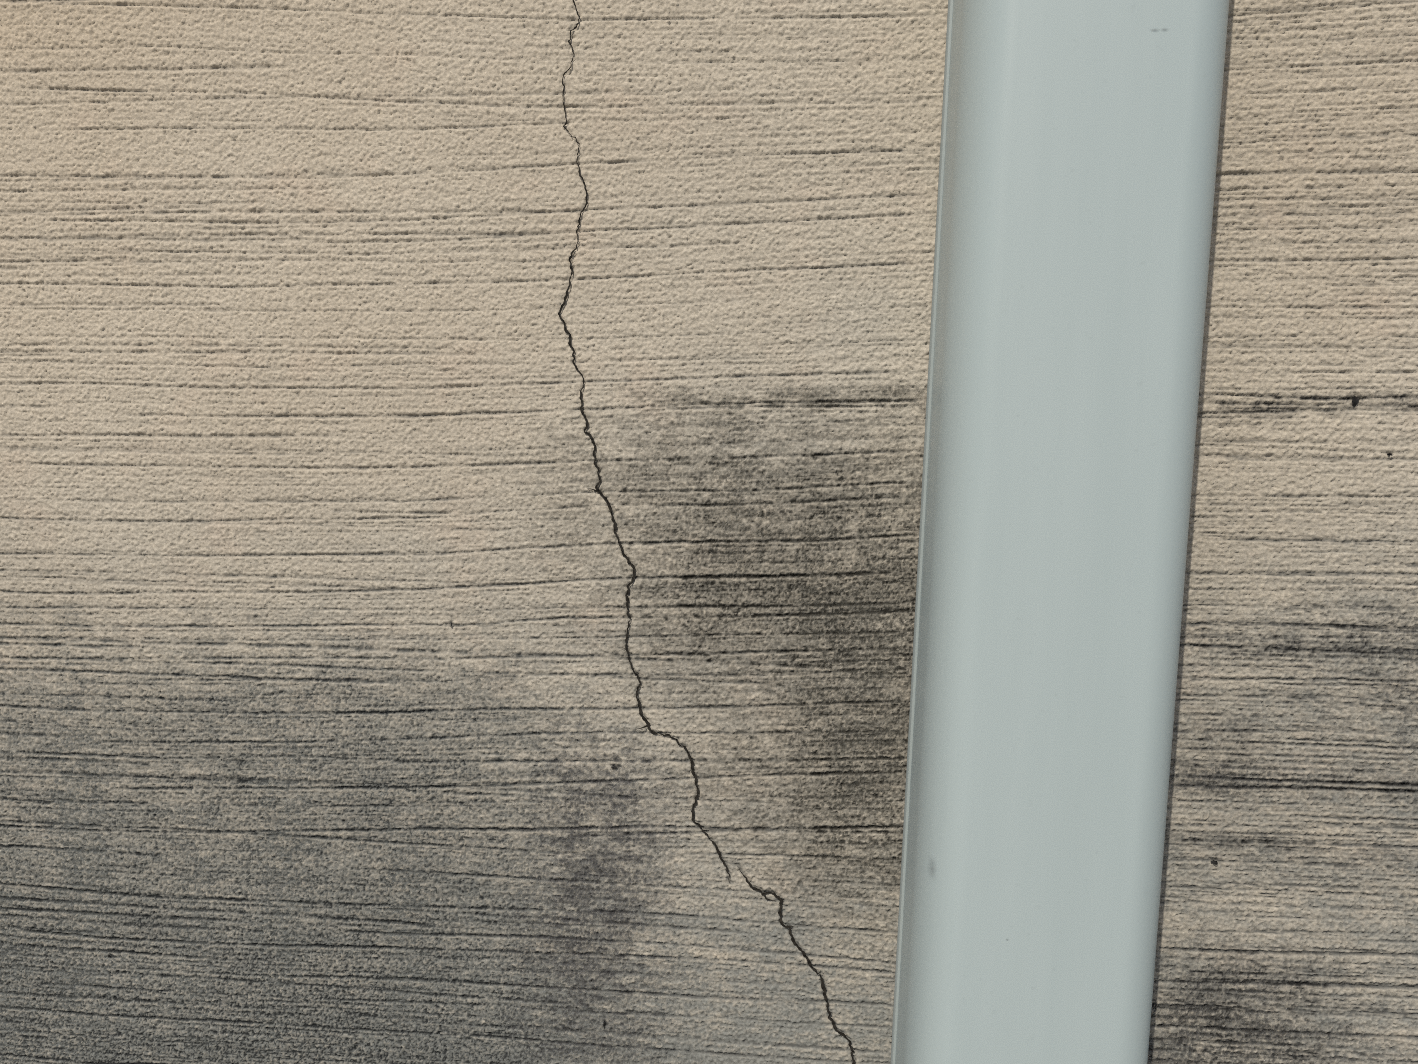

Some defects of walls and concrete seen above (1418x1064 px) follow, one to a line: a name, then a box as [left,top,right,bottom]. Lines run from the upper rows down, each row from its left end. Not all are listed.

leakage [769,391,911,407]
leakage [1220,395,1418,413]
crack [558,0,855,1064]
leakage [618,423,922,895]
leakage [1228,622,1418,660]
leakage [1169,720,1418,800]
leakage [0,637,675,1064]
leakage [1148,949,1353,1064]